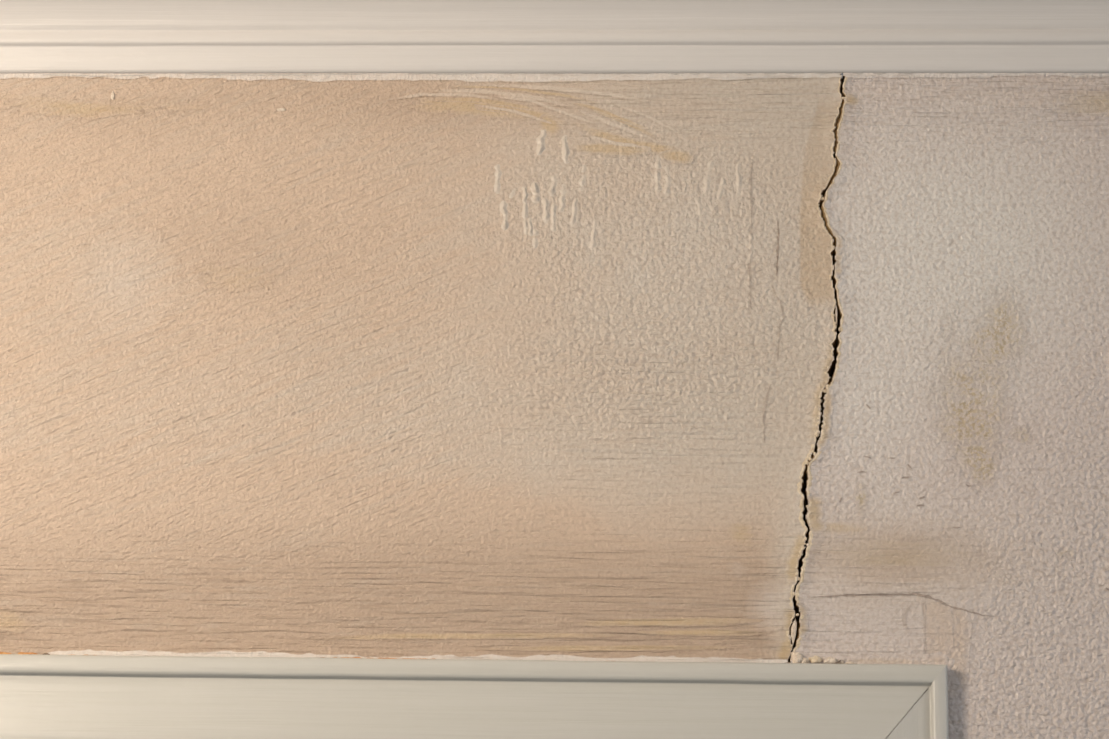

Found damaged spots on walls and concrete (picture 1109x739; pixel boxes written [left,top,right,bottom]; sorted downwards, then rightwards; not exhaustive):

crack [412,73,1001,662]